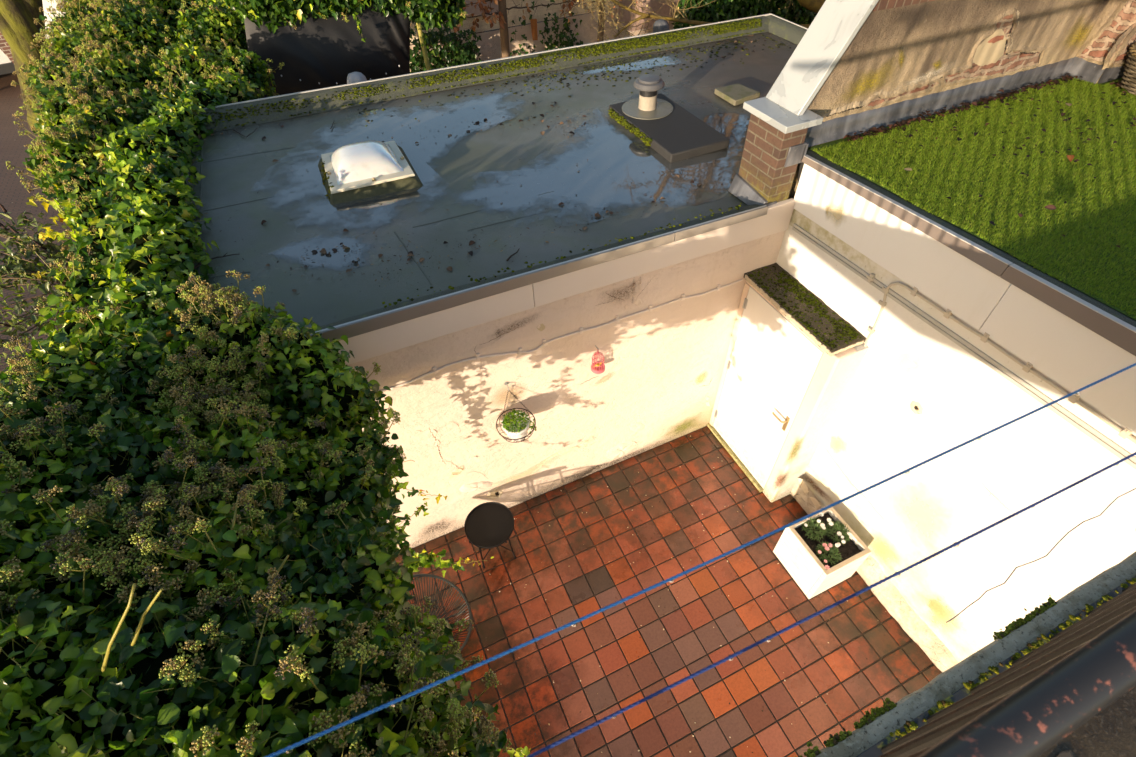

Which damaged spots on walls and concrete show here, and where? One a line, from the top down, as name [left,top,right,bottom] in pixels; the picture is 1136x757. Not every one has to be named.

flaking render [863,8,1046,111]
flaking render [1075,0,1136,70]